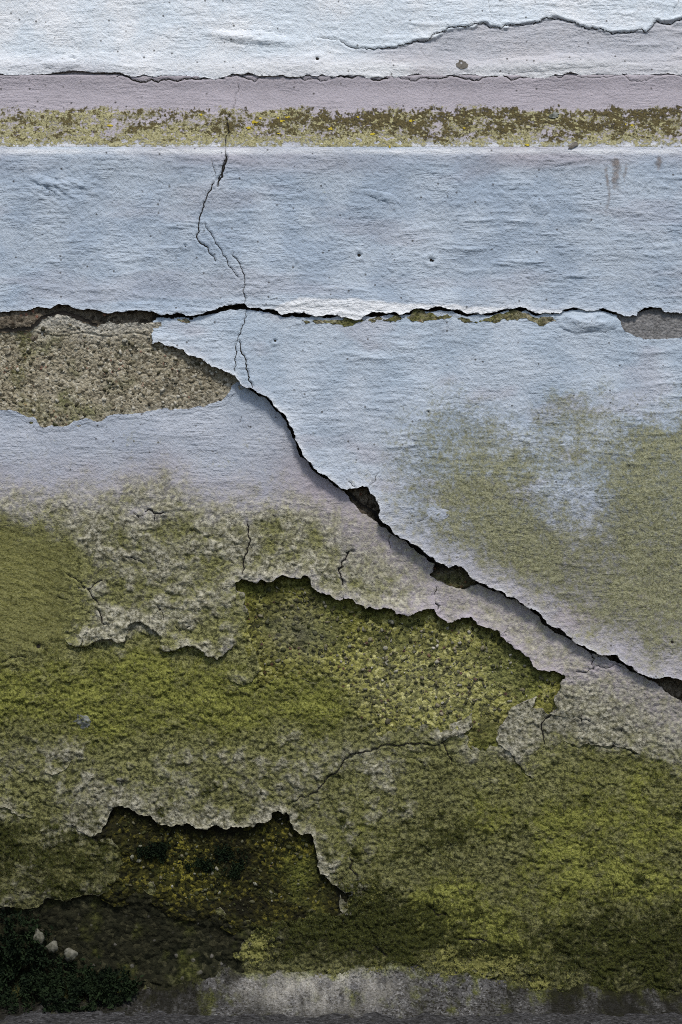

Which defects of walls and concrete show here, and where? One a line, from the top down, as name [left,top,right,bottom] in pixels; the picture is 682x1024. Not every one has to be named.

crack [318,2,682,50]
flaking render [0,314,245,433]
crack [0,75,682,701]
flaking render [63,562,642,778]
crack [287,739,452,808]
flaking render [0,793,356,991]